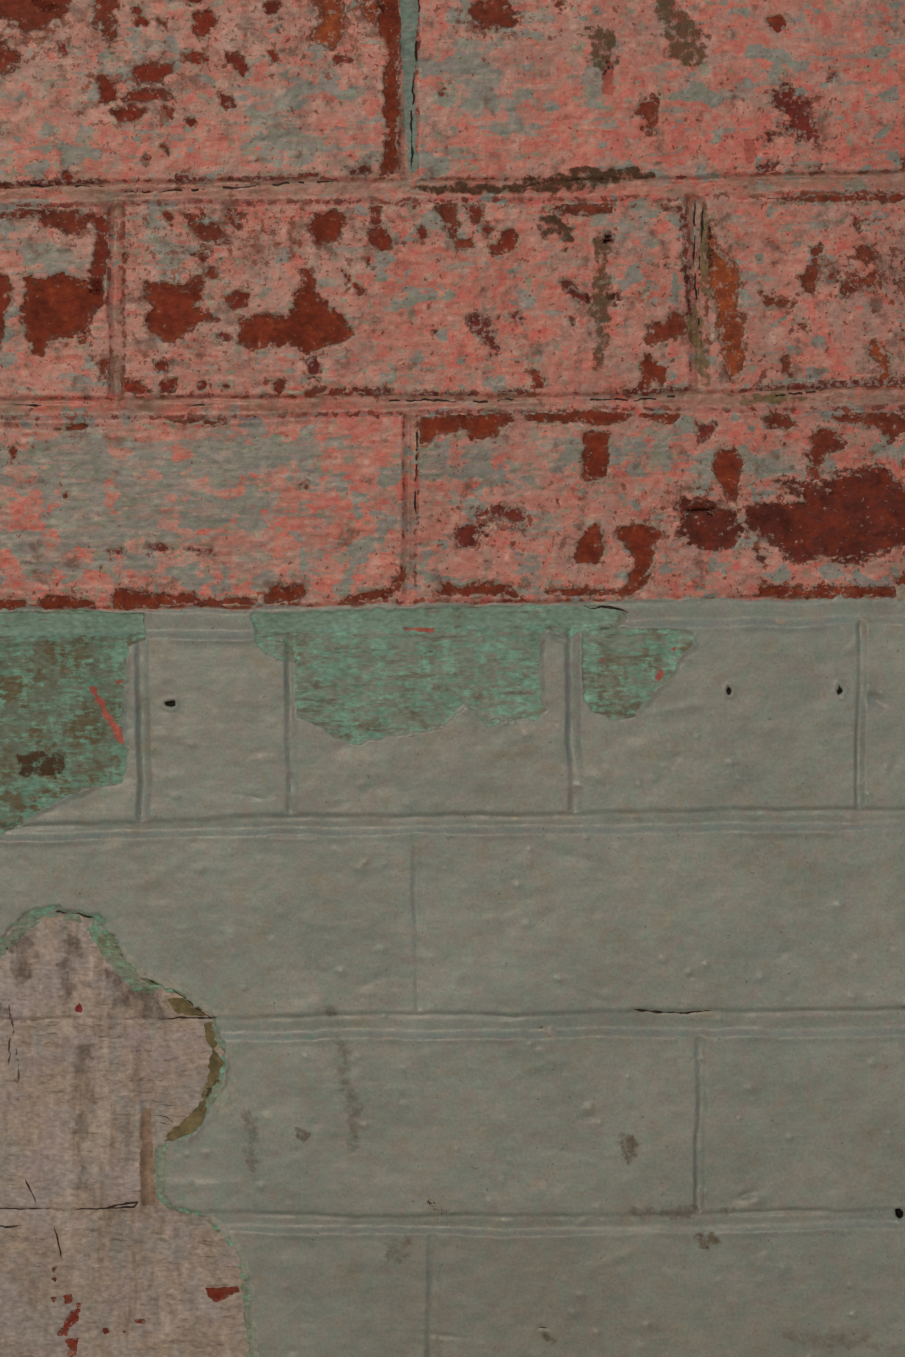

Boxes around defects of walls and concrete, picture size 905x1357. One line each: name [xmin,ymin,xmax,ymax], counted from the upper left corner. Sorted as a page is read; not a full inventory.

peeling [0,0,70,75]
peeling [93,0,168,53]
peeling [97,52,209,127]
peeling [311,0,402,176]
peeling [743,78,820,174]
peeling [0,208,129,357]
peeling [144,205,394,397]
peeling [434,202,519,255]
peeling [622,204,746,397]
peeling [759,218,905,309]
peeling [0,410,905,834]
peeling [0,905,259,1357]